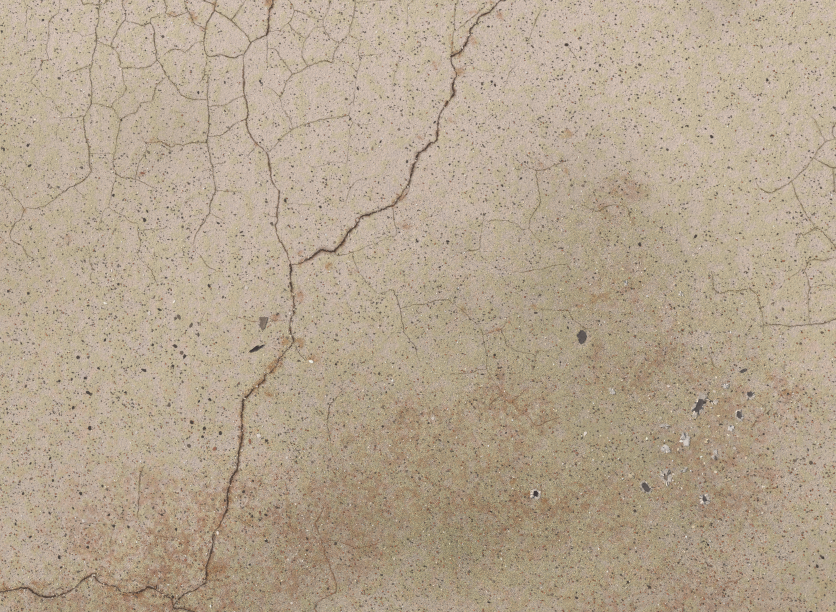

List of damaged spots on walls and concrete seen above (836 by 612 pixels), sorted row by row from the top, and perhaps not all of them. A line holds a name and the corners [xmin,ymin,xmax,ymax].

crack [0,0,564,612]
crack [711,118,836,334]